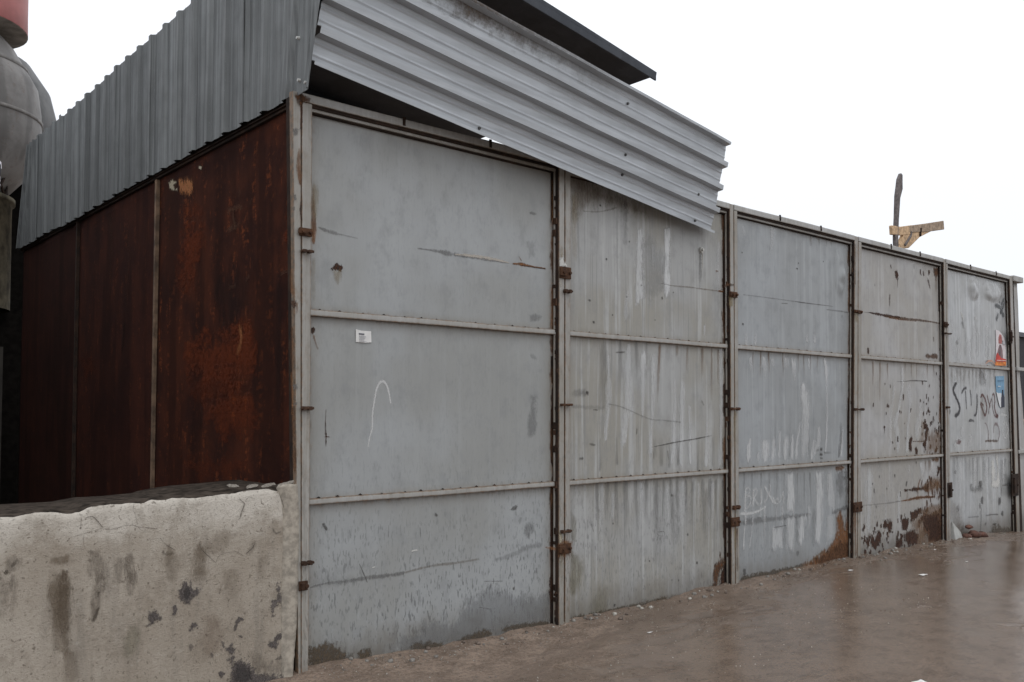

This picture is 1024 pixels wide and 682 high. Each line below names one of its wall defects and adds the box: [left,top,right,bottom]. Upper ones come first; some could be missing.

peeling [169,179,193,196]
corrosion [803,402,950,566]